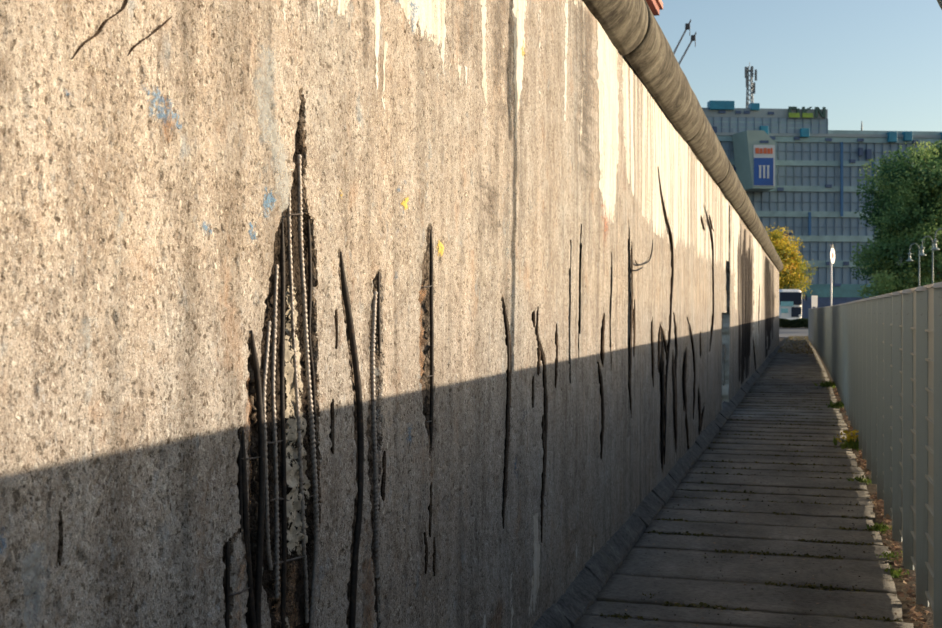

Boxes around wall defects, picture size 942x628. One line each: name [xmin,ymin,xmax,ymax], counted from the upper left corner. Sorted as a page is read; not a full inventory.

spalling [238,88,322,628]
spalling [340,251,381,628]
crack [501,297,558,543]
crack [597,313,605,459]
crack [628,167,714,471]
crack [752,286,760,368]